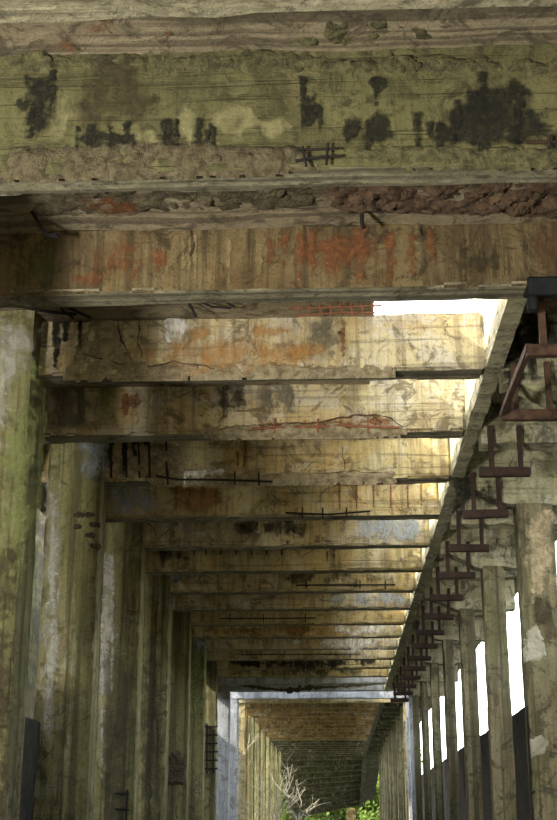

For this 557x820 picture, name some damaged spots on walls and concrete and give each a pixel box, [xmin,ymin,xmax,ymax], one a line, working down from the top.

leakage [16,64,56,138]
leakage [412,72,553,151]
spalling [26,183,557,239]
leakage [1,327,31,398]
leakage [52,320,89,368]
leakage [234,521,306,543]